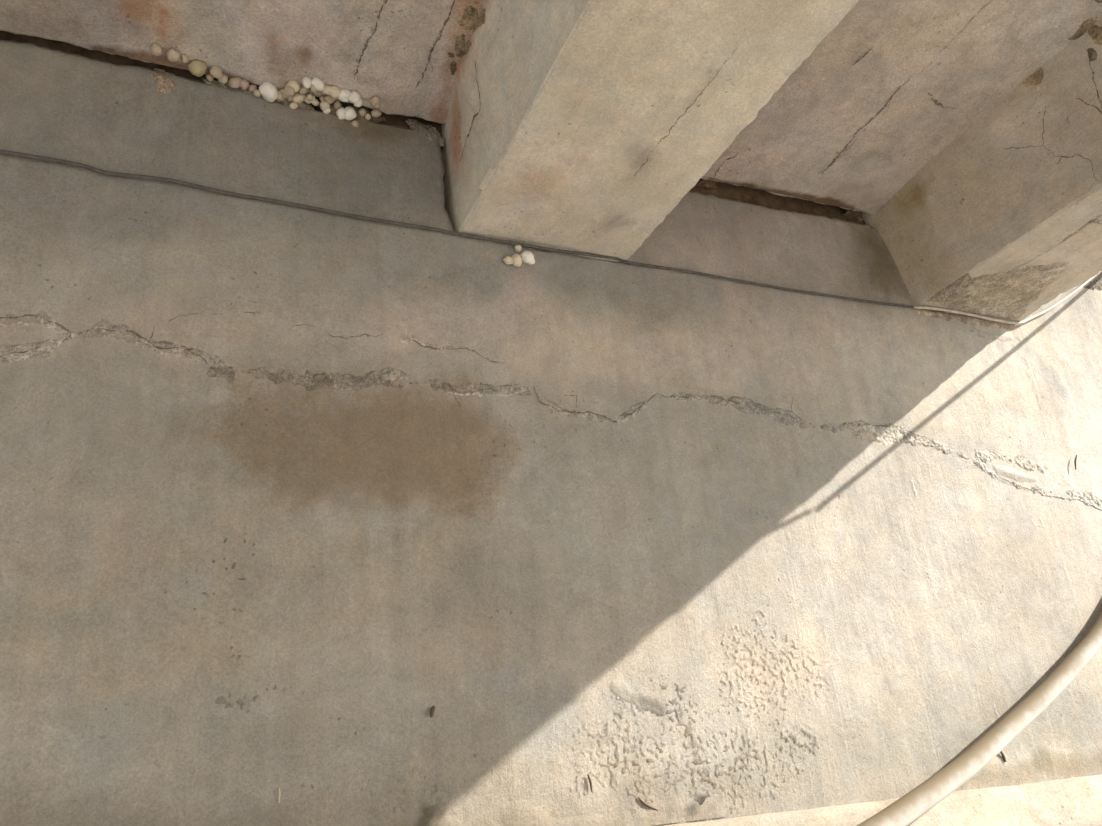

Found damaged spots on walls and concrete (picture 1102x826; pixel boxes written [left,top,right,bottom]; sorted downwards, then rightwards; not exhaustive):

damp [257,19,321,79]
crack [353,0,388,80]
crack [417,1,455,86]
crack [634,52,734,176]
crack [816,2,991,175]
crack [1008,106,1098,181]
crack [1077,63,1102,114]
crack [987,215,1102,287]
damp [152,344,533,563]
crack [0,311,1102,511]